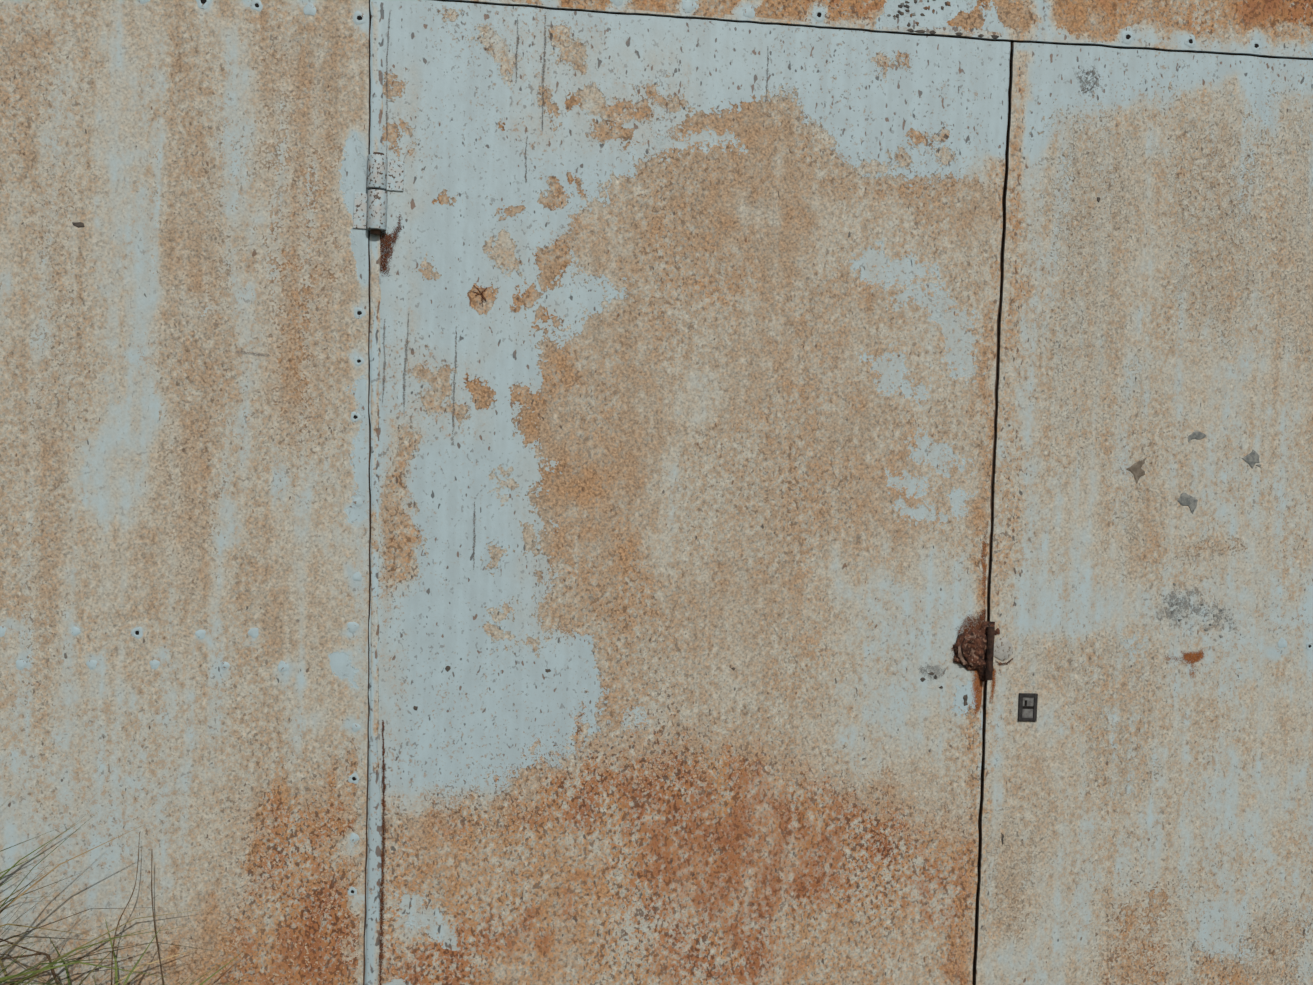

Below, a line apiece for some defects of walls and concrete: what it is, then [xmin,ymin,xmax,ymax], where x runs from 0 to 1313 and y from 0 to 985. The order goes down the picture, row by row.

rust [561,0,887,26]
rust [947,0,1033,36]
rust [1051,0,1313,43]
rust [537,23,689,151]
rust [856,124,959,181]
rust [380,214,402,276]
rust [144,14,357,614]
peeling [385,83,1000,872]
rust [970,622,1205,808]
peeling [394,890,464,951]
rust [1080,864,1313,985]
peeling [382,974,412,985]